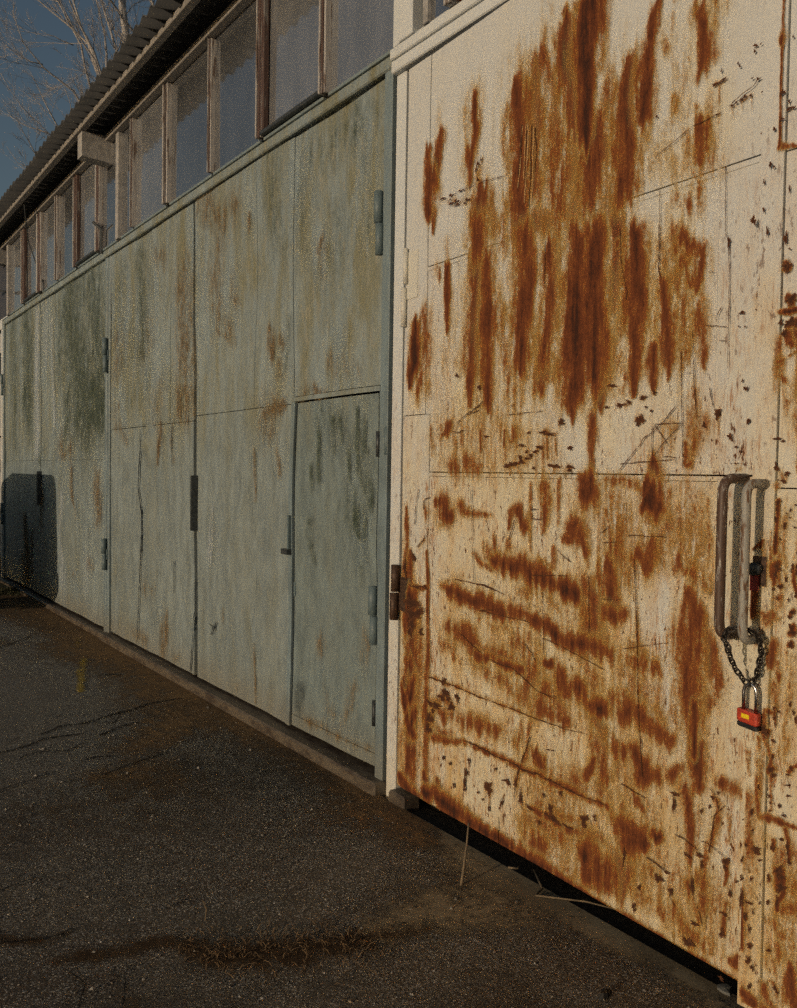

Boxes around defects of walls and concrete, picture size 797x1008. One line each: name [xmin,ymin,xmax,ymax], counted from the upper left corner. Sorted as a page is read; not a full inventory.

damp [22,315,47,465]
damp [53,369,105,445]
crack [135,439,143,639]
corrosion [397,0,797,1008]